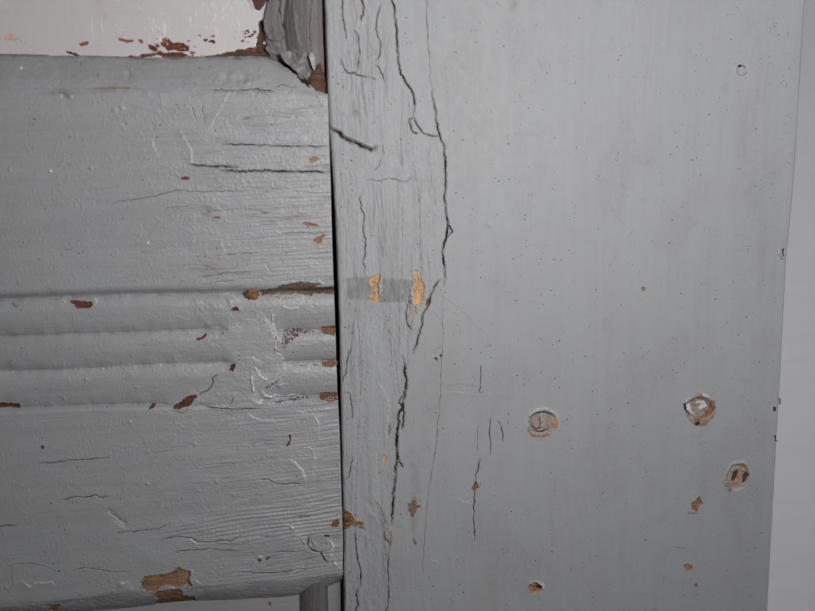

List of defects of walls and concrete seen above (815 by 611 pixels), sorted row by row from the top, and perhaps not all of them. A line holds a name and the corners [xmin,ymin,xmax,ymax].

peeling [118,0,327,93]
crack [114,164,323,209]
crack [227,127,411,274]
crack [340,0,453,523]
peeling [70,296,93,309]
peeling [408,270,431,314]
peeling [173,395,197,413]
peeling [686,394,711,415]
peeling [139,568,196,604]
crack [121,526,237,553]
crack [245,538,327,574]
crack [354,534,366,611]